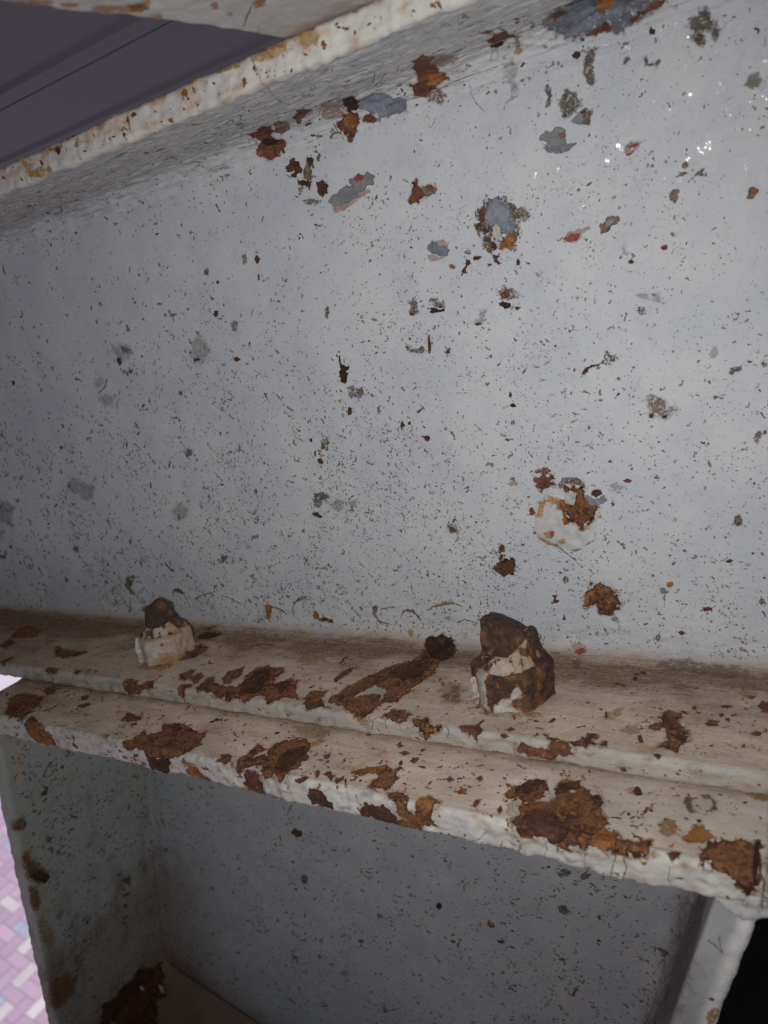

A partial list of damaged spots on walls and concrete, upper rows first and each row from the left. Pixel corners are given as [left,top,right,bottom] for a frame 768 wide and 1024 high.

peeling [596,0,615,14]
rust [427,5,599,110]
rust [243,36,405,180]
peeling [297,149,375,213]
peeling [479,198,529,250]
rust [0,96,768,848]
peeling [529,485,576,517]
peeling [591,489,607,505]
rust [0,671,708,1024]